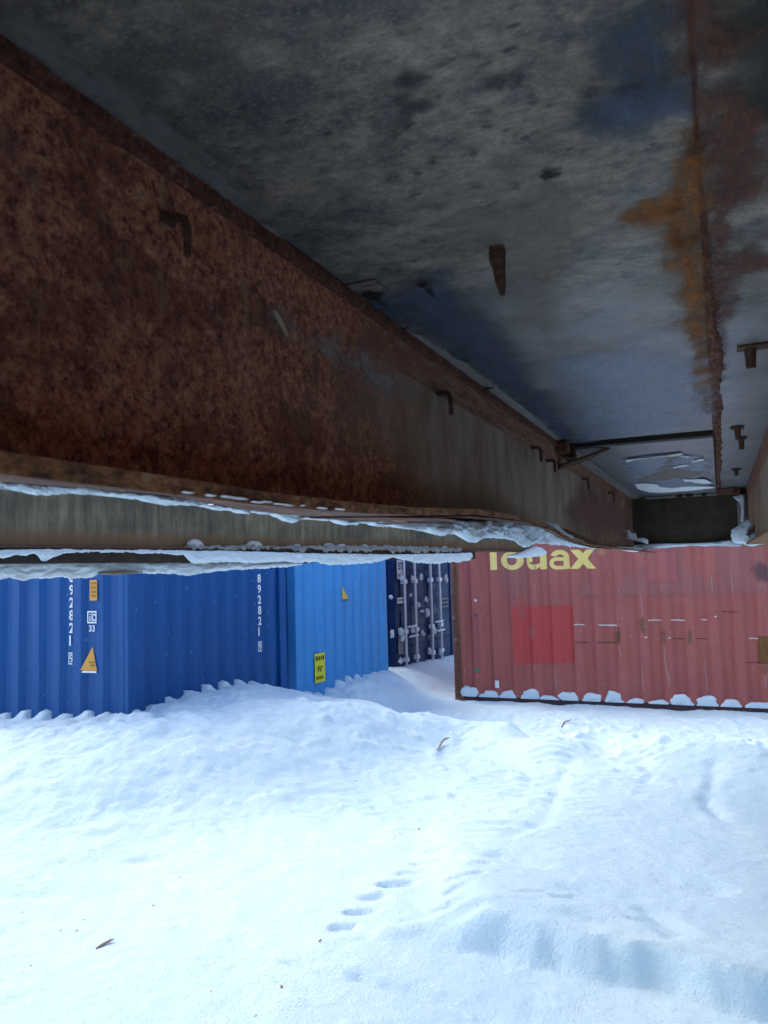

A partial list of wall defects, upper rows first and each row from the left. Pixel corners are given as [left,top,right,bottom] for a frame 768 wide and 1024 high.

peeling [623,453,715,493]